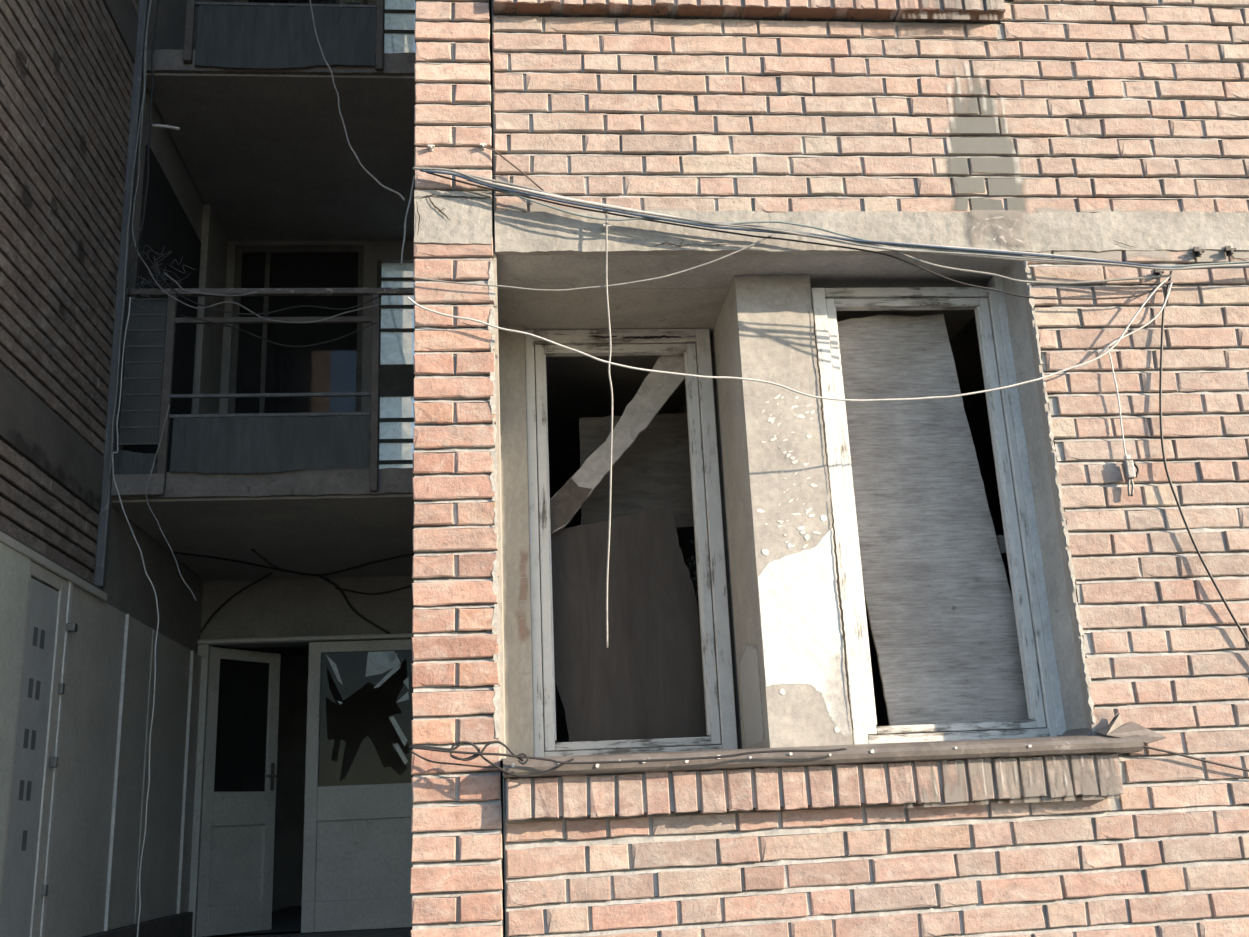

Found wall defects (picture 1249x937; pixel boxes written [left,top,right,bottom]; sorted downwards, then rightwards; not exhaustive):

leakage [948,78,1029,245]
peeling [757,394,850,734]